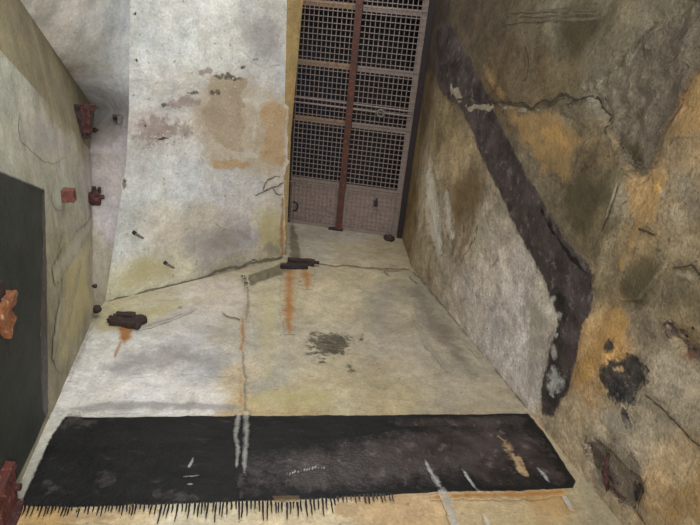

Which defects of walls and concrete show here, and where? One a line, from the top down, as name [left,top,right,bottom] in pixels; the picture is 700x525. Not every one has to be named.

damp [183,60,286,186]
crack [254,175,285,197]
crack [450,83,614,137]
rust [113,327,135,359]
damp [17,288,341,499]
crack [106,255,284,414]
rust [277,196,316,334]
damp [302,275,485,383]
damp [522,167,670,435]
spalling [581,432,648,512]